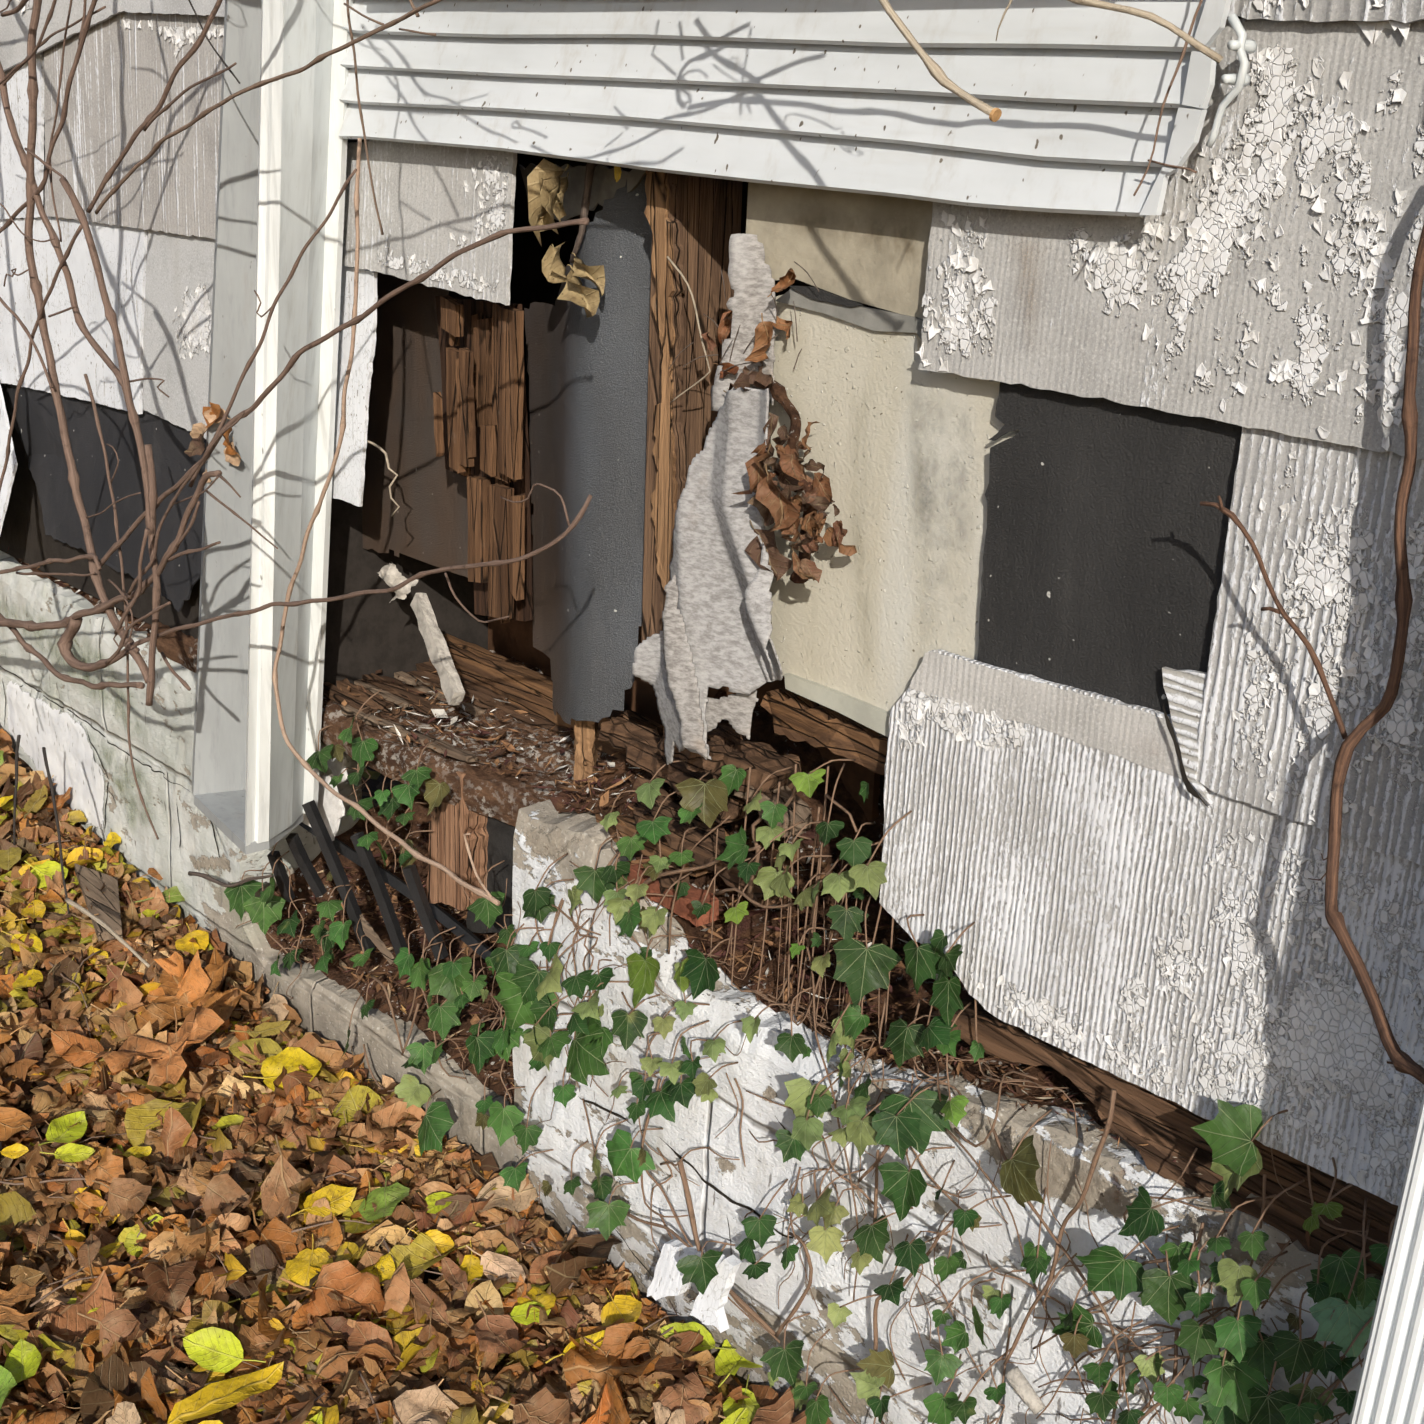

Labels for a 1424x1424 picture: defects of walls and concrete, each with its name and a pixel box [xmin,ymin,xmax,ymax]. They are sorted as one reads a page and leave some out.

peeling [1243,0,1284,17]
peeling [1354,0,1411,44]
peeling [173,282,212,360]
peeling [377,155,509,293]
peeling [916,210,998,372]
peeling [1067,41,1424,451]
peeling [1232,451,1424,824]
peeling [894,689,1027,752]
peeling [967,824,1424,1201]
crack [579,1097,632,1125]
crack [667,1144,804,1255]
spalling [965,1107,1282,1265]